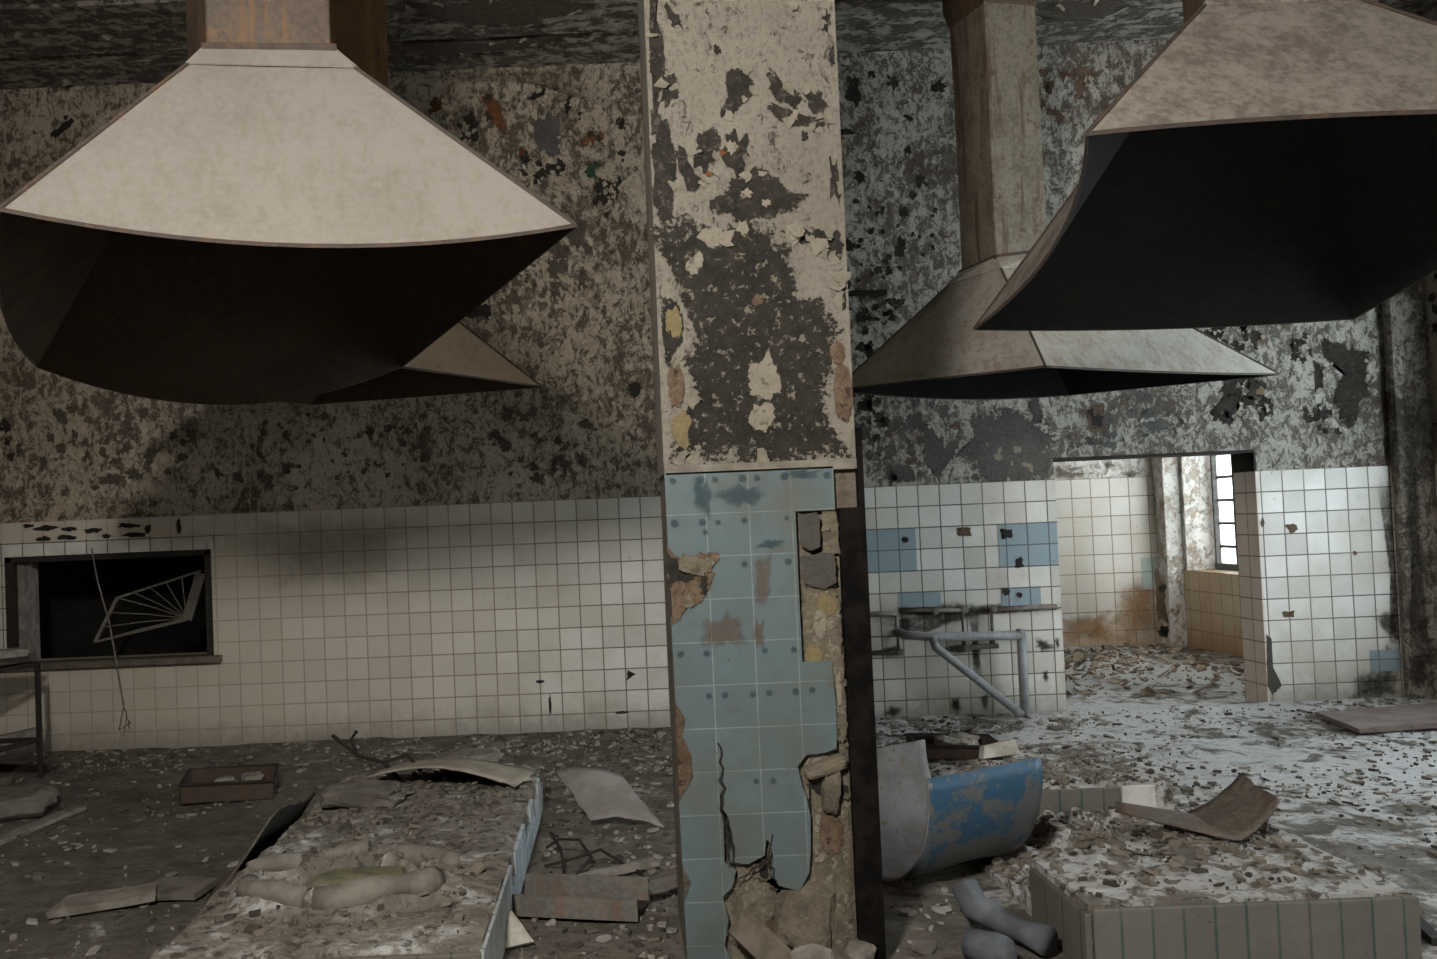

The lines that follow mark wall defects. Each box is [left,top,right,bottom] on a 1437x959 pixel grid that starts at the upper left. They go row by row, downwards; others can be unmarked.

peeling [517,88,583,185]
peeling [501,219,593,305]
peeling [645,0,1187,486]
peeling [39,402,198,491]
peeling [1201,326,1266,352]
peeling [1210,377,1274,426]
peeling [1289,332,1371,435]
damp [1380,373,1431,685]
spalling [665,546,720,626]
flaking render [797,510,857,959]
crack [717,742,778,884]
spalling [728,845,794,959]